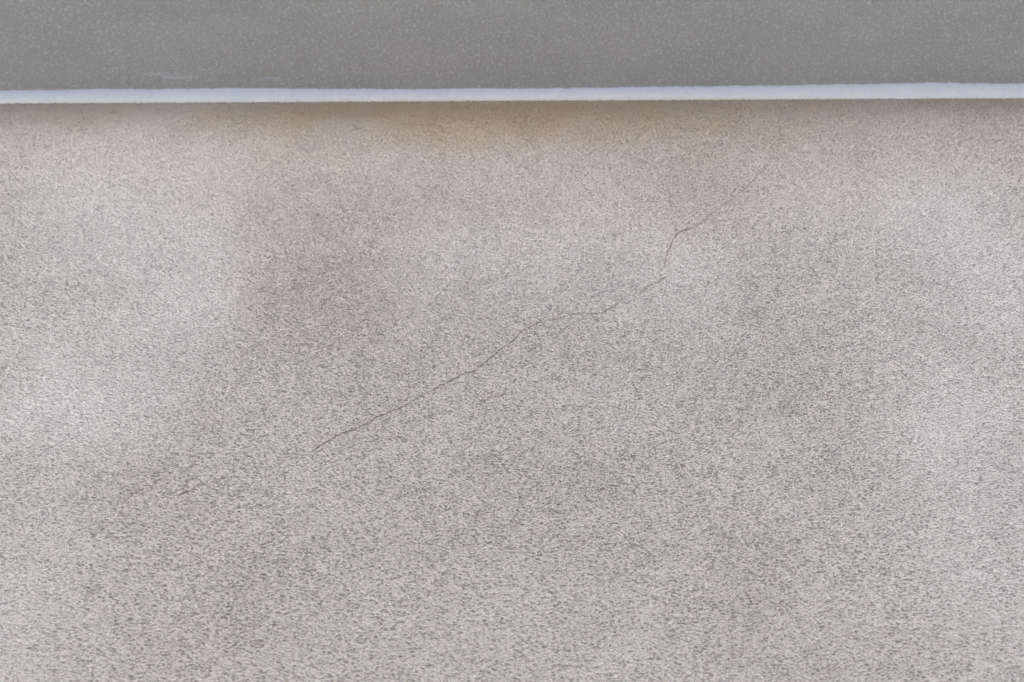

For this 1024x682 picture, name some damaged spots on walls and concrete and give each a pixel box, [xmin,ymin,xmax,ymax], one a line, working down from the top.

crack [314,164,769,449]